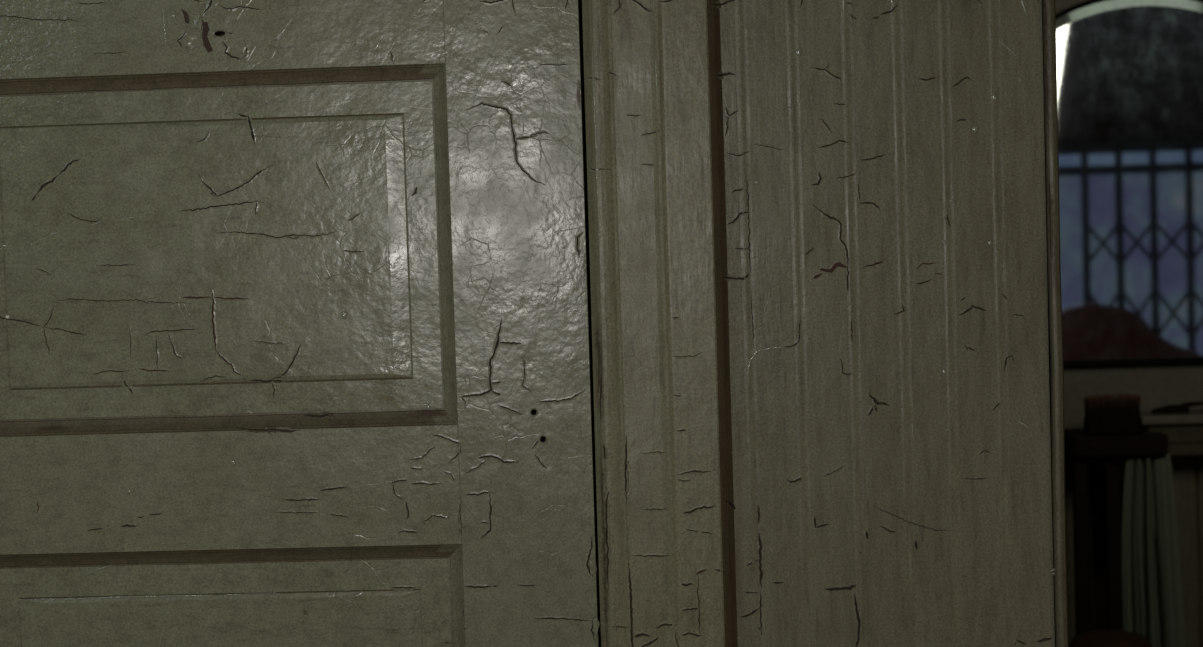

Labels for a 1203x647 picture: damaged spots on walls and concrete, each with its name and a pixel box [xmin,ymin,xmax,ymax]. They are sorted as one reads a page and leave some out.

crack [0,1,107,23]
crack [479,0,516,35]
crack [612,0,675,40]
crack [31,159,80,201]
crack [179,113,387,262]
crack [466,81,549,185]
crack [712,64,904,416]
crack [0,267,302,398]
crack [235,411,334,433]
crack [390,434,547,539]
crack [460,319,784,647]
crack [441,583,537,644]